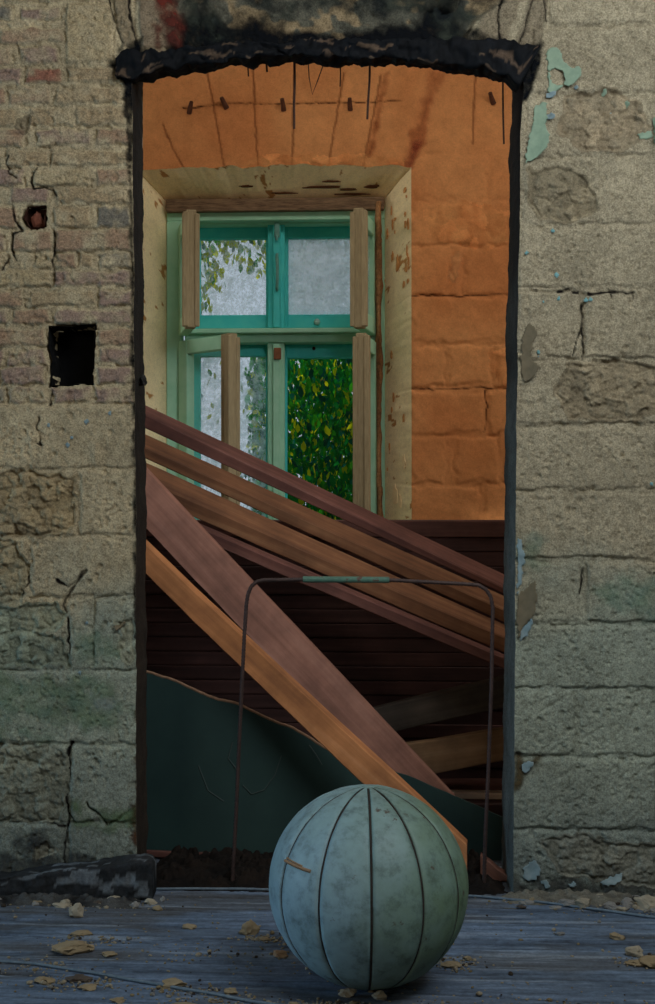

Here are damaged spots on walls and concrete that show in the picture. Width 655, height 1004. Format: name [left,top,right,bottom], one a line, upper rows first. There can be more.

flaking render [525,47,655,225]
crack [6,155,57,196]
crack [2,208,23,271]
crack [49,231,57,275]
crack [535,288,634,357]
flaking render [516,538,538,641]
crack [67,741,75,769]
crack [54,794,129,863]